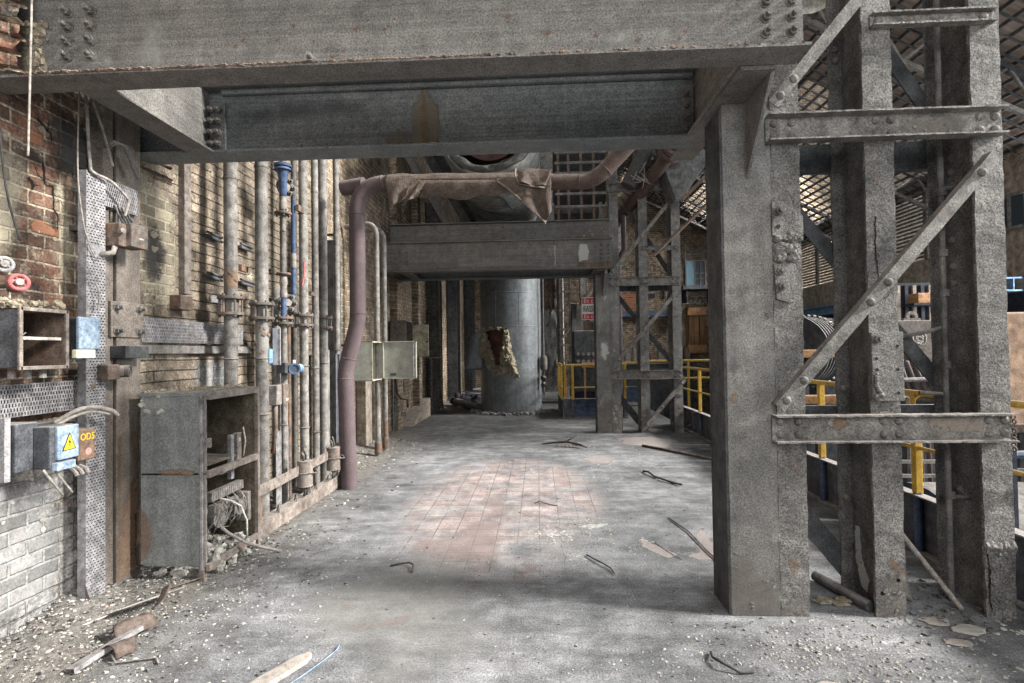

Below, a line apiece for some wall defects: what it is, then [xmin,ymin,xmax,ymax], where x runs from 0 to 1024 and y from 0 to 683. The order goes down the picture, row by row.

crack [27,118,63,231]